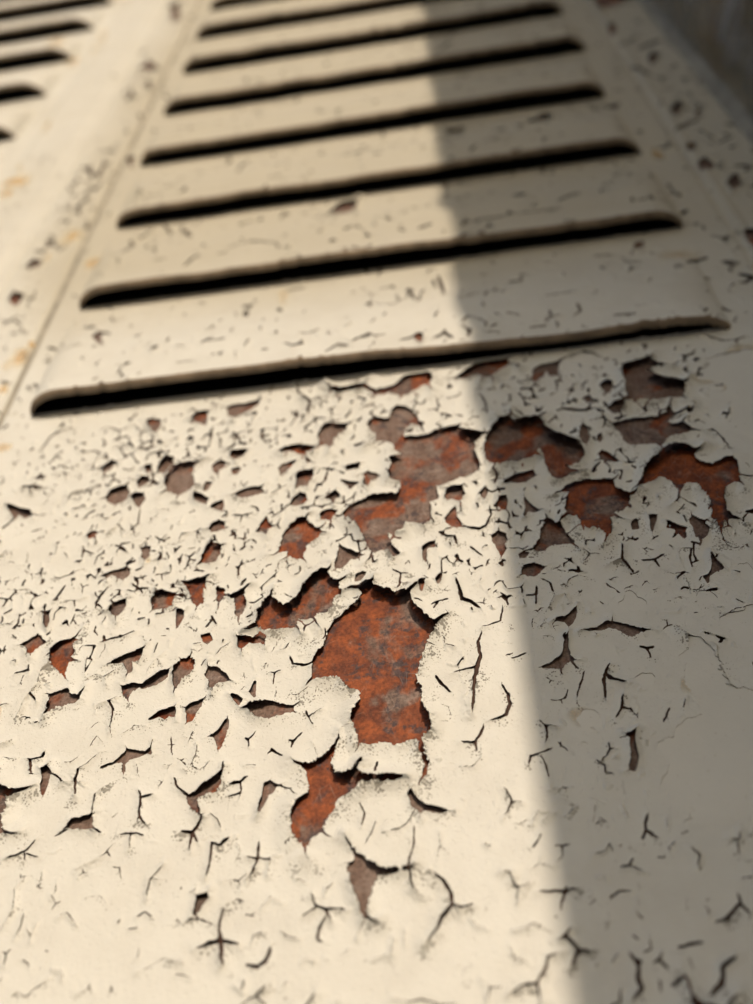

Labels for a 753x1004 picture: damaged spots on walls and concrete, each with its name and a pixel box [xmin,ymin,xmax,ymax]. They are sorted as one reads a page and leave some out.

peeling [314,194,370,220]
crack [0,0,753,404]
peeling [402,327,434,348]
peeling [0,498,42,526]
peeling [10,609,96,729]
crack [0,262,753,888]
peeling [90,345,753,945]
crack [0,826,85,1004]
peeling [0,754,109,854]
crack [69,974,125,1004]
crack [348,793,497,978]
crack [377,638,753,1004]